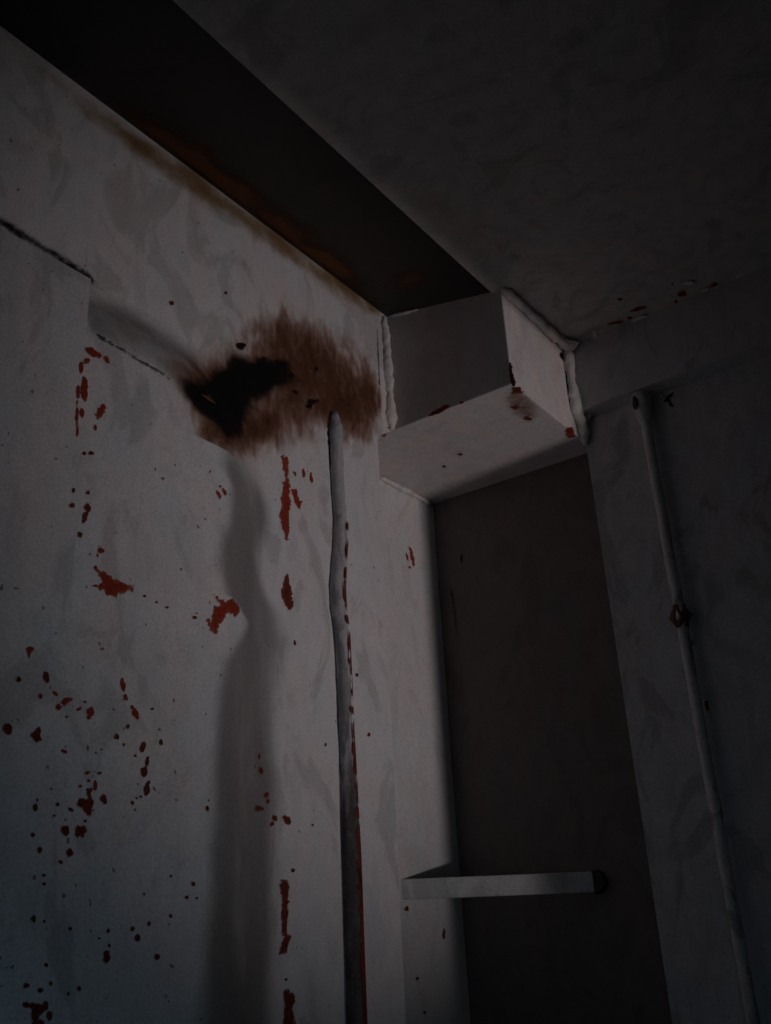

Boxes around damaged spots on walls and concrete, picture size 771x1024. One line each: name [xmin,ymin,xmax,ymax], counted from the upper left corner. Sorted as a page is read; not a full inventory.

rust [75,347,110,437]
rust [70,488,91,538]
rust [280,455,313,541]
rust [93,547,169,609]
rust [193,594,240,634]
rust [39,671,94,719]
rust [114,678,139,746]
rust [131,742,150,811]
rust [344,522,368,1024]
rust [53,771,107,864]
rust [279,869,295,955]
rust [22,981,53,1024]